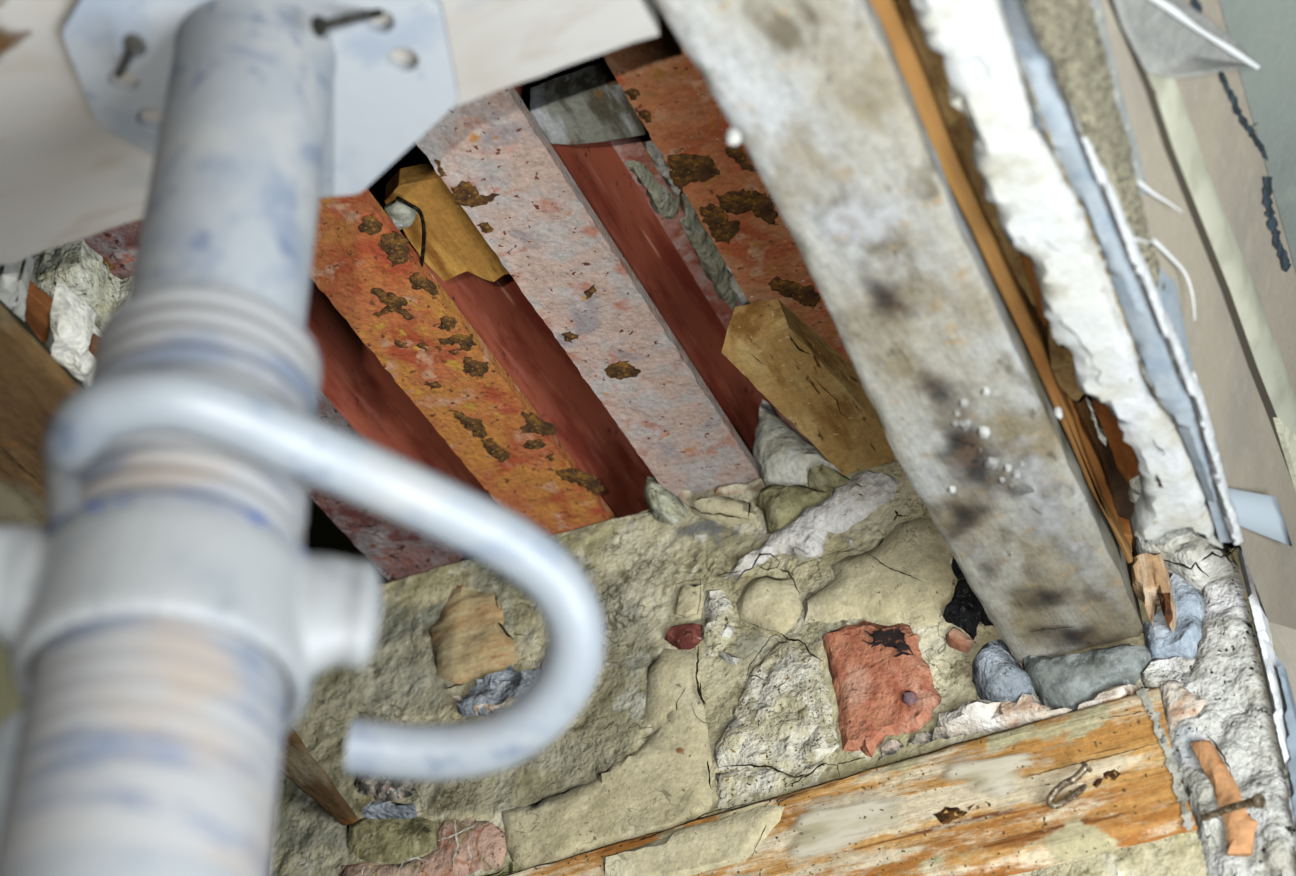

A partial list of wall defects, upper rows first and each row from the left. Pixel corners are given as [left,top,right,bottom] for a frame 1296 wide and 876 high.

efflorescence [822,201,890,241]
water stain [874,285,907,312]
water stain [945,430,991,485]
crack [637,501,750,520]
efflorescence [724,470,899,578]
water stain [952,504,987,533]
water stain [1040,593,1065,605]
crack [671,510,925,723]
water stain [716,624,739,665]
water stain [1041,629,1099,646]
spalling [1093,769,1121,788]
hole [933,804,974,824]